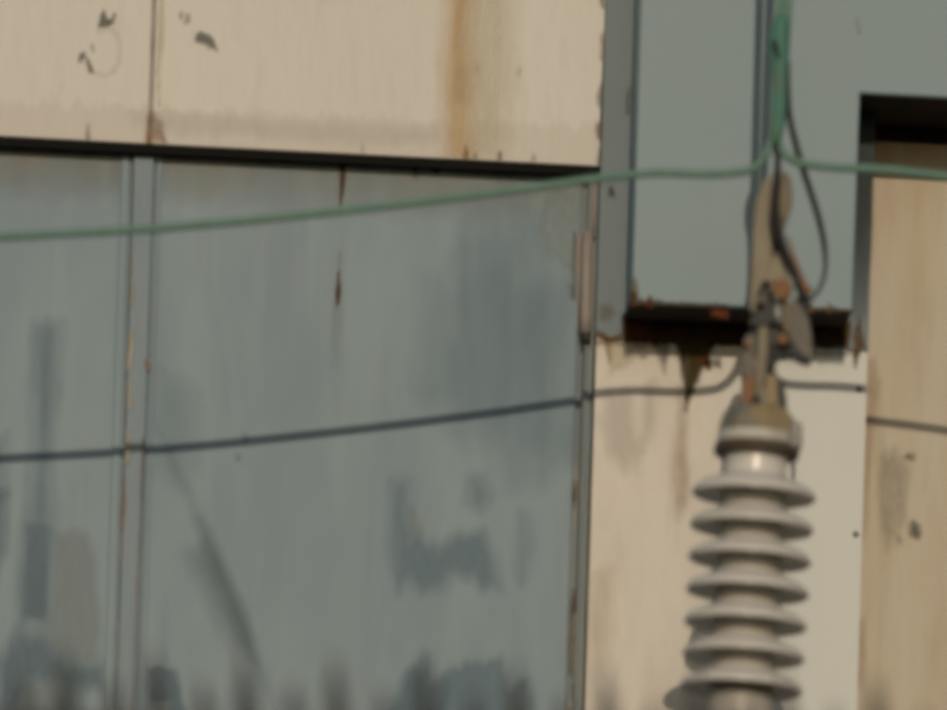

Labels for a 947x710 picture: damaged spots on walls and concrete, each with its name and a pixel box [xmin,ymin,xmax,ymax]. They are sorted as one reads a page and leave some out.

peeling [99,10,115,27]
peeling [196,32,217,50]
corrosion [597,285,750,366]
corrosion [805,306,864,364]